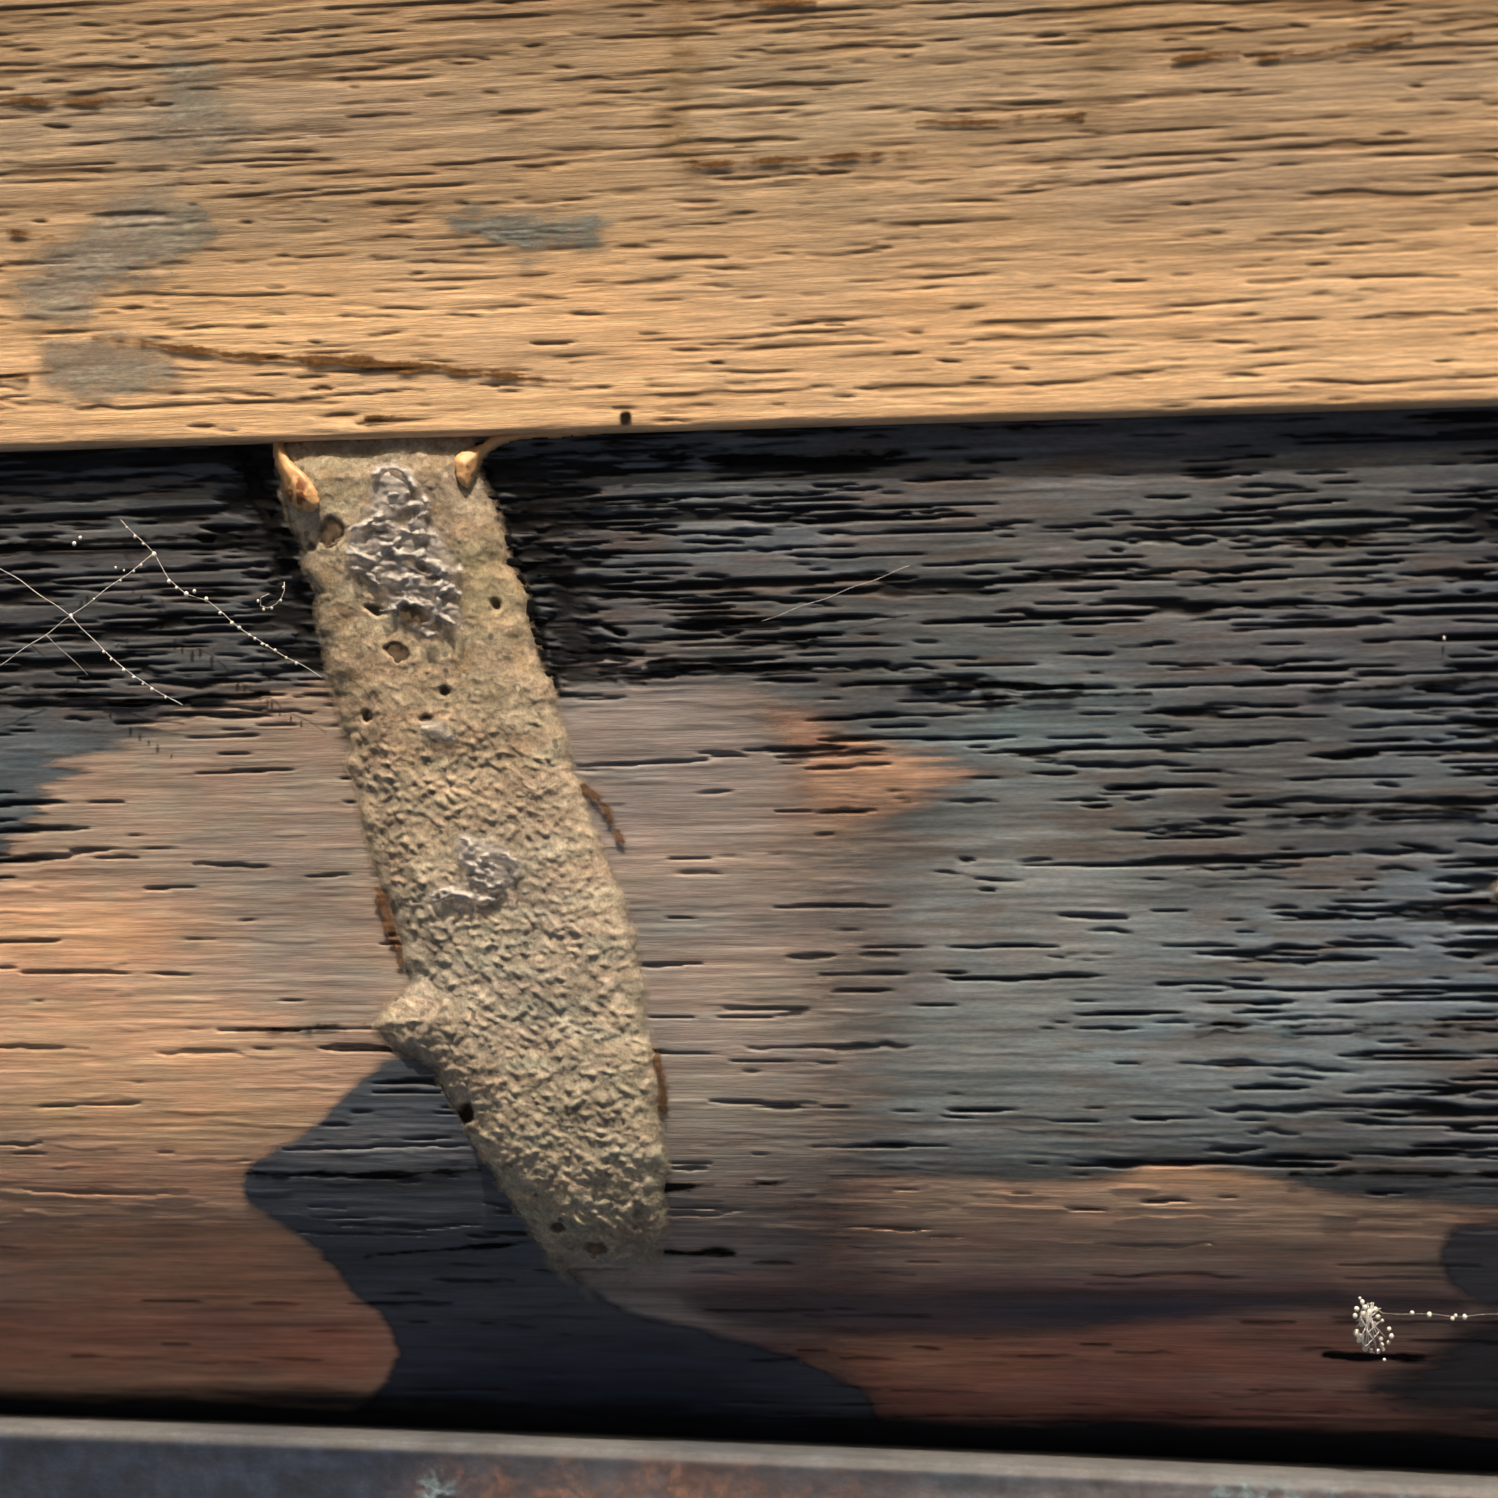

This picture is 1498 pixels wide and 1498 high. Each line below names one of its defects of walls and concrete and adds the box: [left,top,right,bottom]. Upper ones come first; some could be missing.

damp [133,55,246,151]
damp [10,185,219,322]
damp [446,205,607,262]
damp [41,331,178,398]